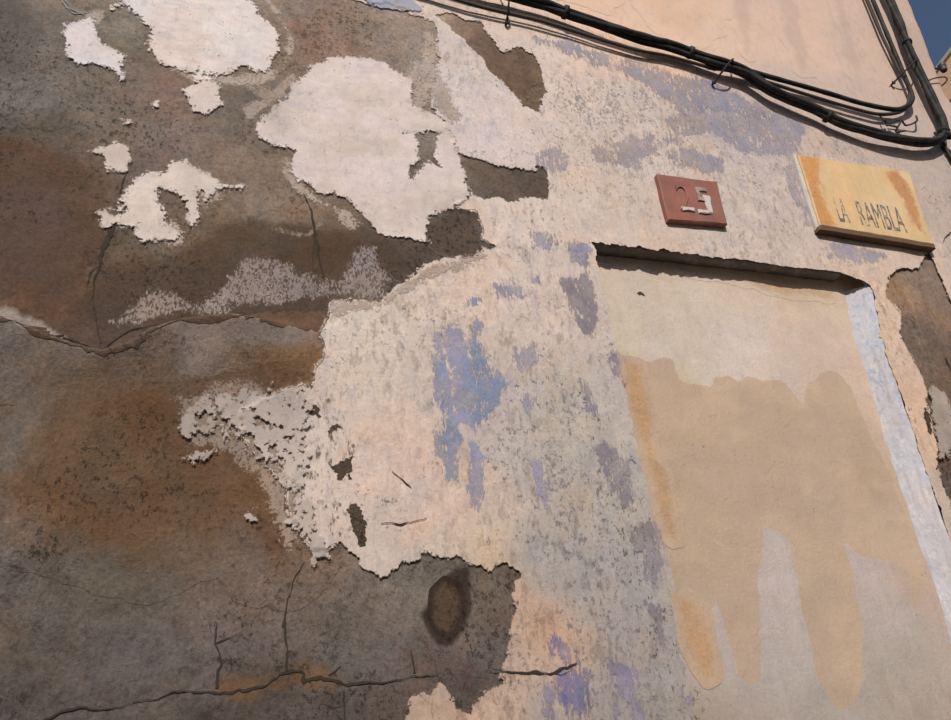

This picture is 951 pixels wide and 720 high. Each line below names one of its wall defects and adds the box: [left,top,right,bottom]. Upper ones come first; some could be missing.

leakage [0,0,59,90]
crack [54,174,160,355]
leakage [0,105,491,559]
flaking render [0,0,811,358]
flaking render [886,254,951,507]
crack [43,562,439,720]
leakage [144,684,342,720]
leakage [414,561,478,653]
crack [492,662,577,675]
leakage [643,355,928,716]